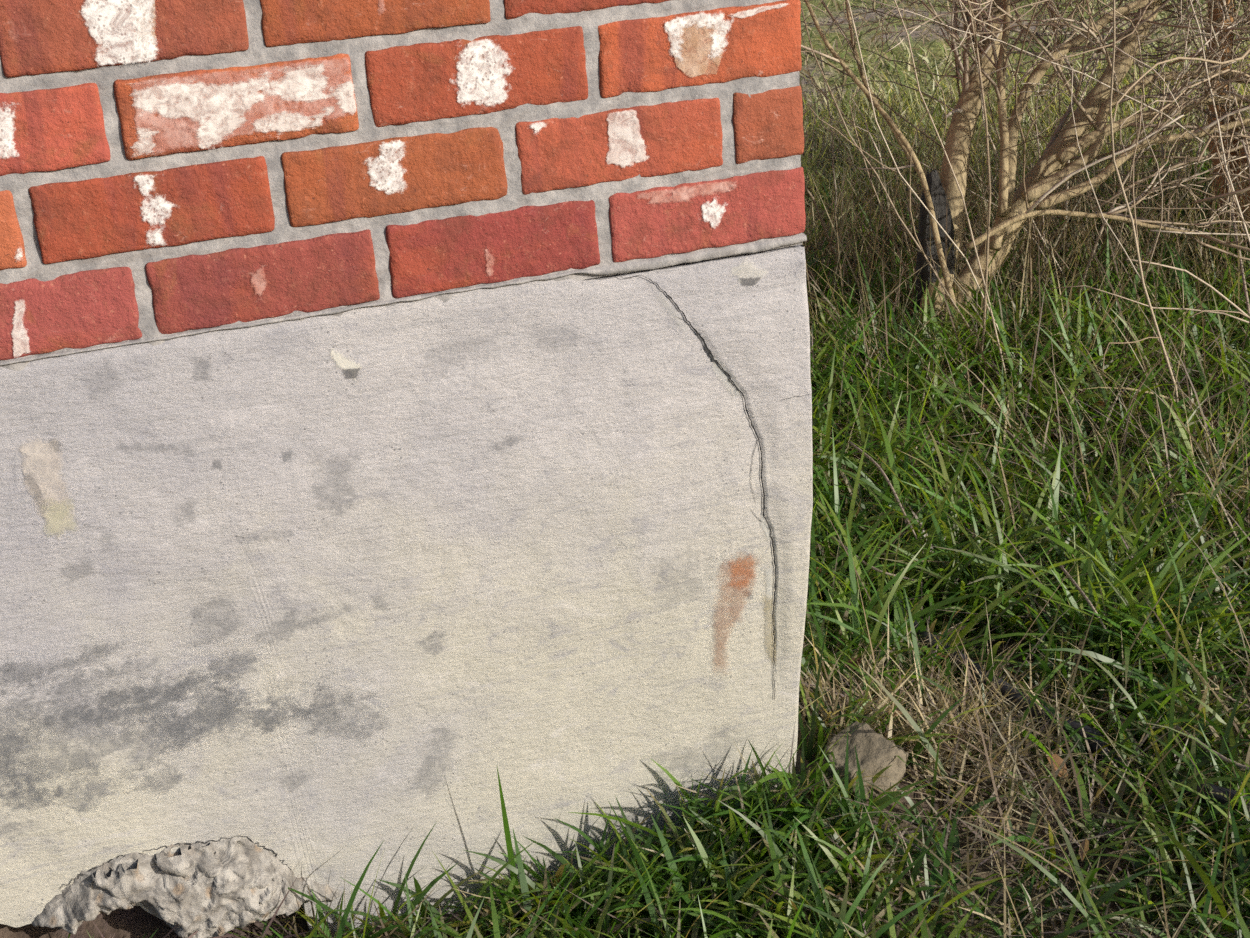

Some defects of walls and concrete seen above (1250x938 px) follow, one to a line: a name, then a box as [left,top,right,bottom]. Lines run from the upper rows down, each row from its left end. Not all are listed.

crack [620,275,776,700]
spalling [31,836,342,938]